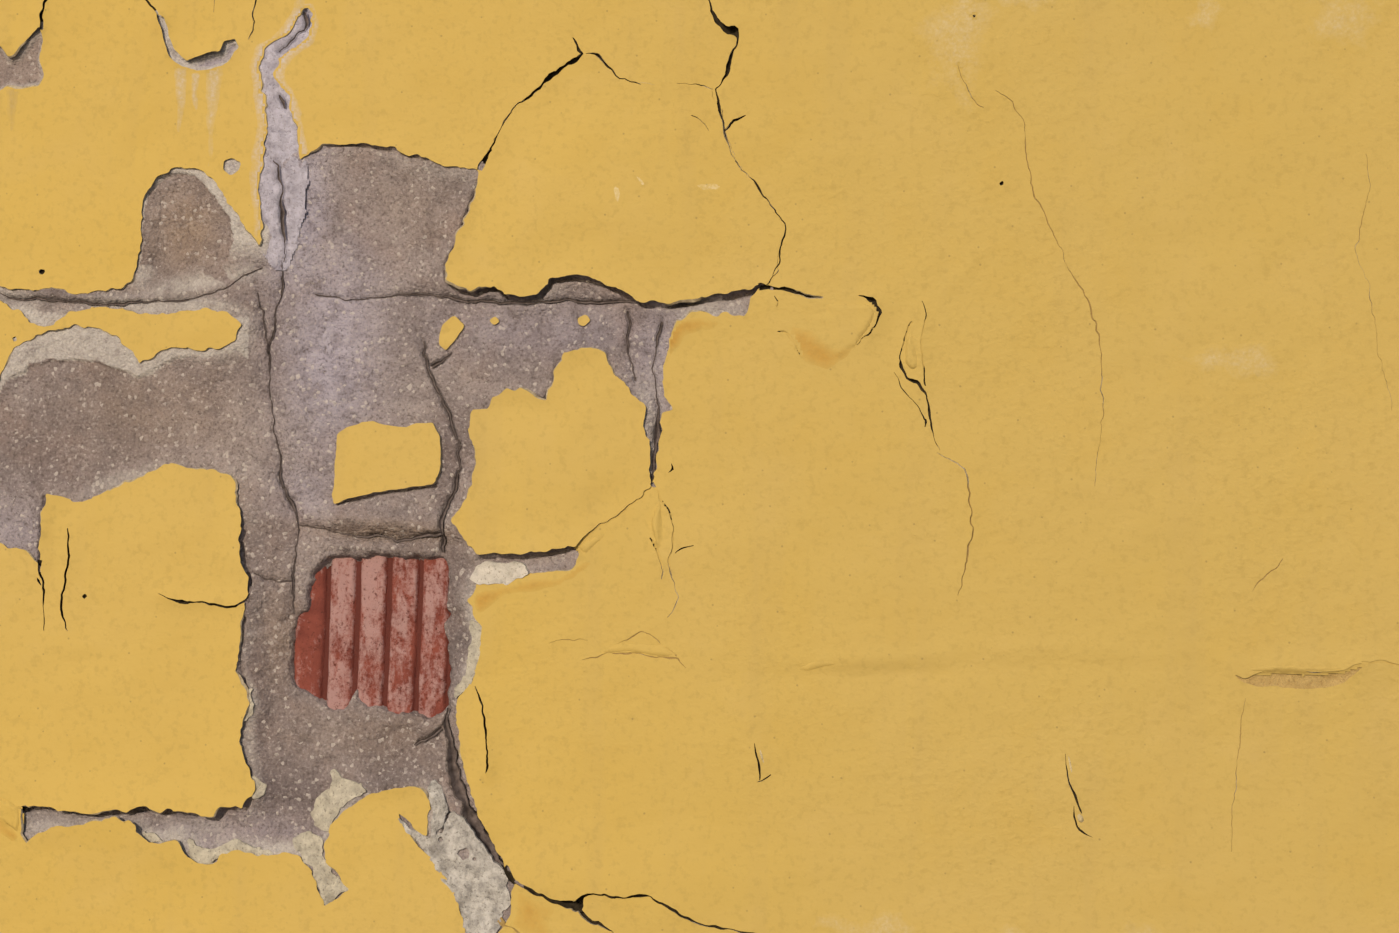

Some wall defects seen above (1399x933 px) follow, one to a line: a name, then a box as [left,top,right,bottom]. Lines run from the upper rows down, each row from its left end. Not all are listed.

spalling [0,22,44,90]
spalling [155,10,238,70]
crack [678,0,746,141]
crack [0,0,694,629]
crack [752,179,821,355]
crack [859,295,938,446]
crack [958,66,1102,375]
spalling [0,53,785,933]
crack [958,485,974,594]
crack [414,691,754,933]